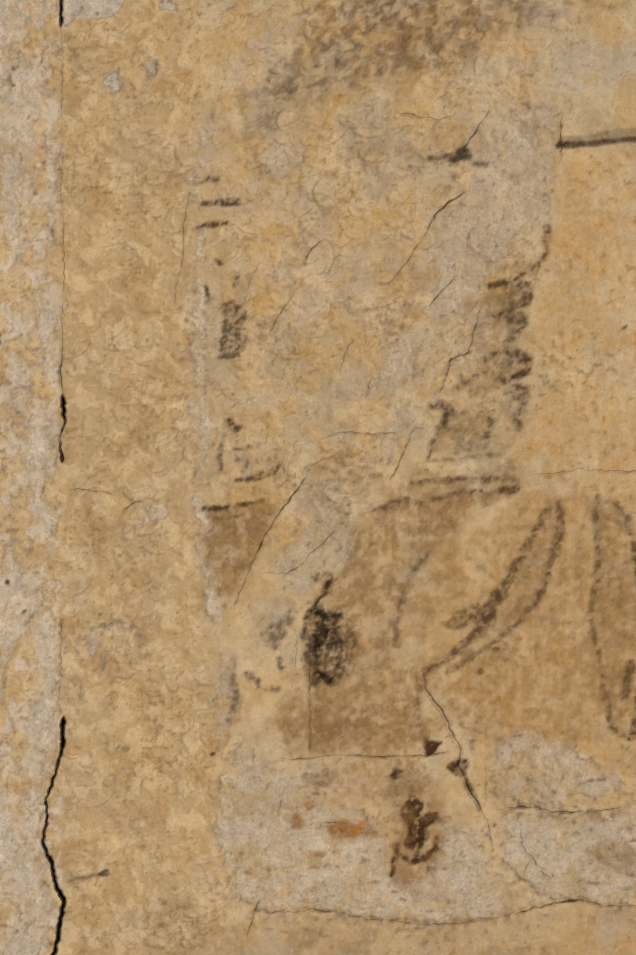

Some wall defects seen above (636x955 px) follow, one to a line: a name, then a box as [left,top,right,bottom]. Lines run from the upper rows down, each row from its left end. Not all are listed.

crack [57,0,65,110]
peeling [0,0,124,239]
peeling [422,107,557,316]
crack [58,218,66,462]
peeling [187,397,224,635]
peeling [254,506,352,645]
crack [42,623,65,955]
peeling [214,731,636,925]
crack [413,679,493,843]
crack [509,806,617,814]
crack [518,899,617,913]